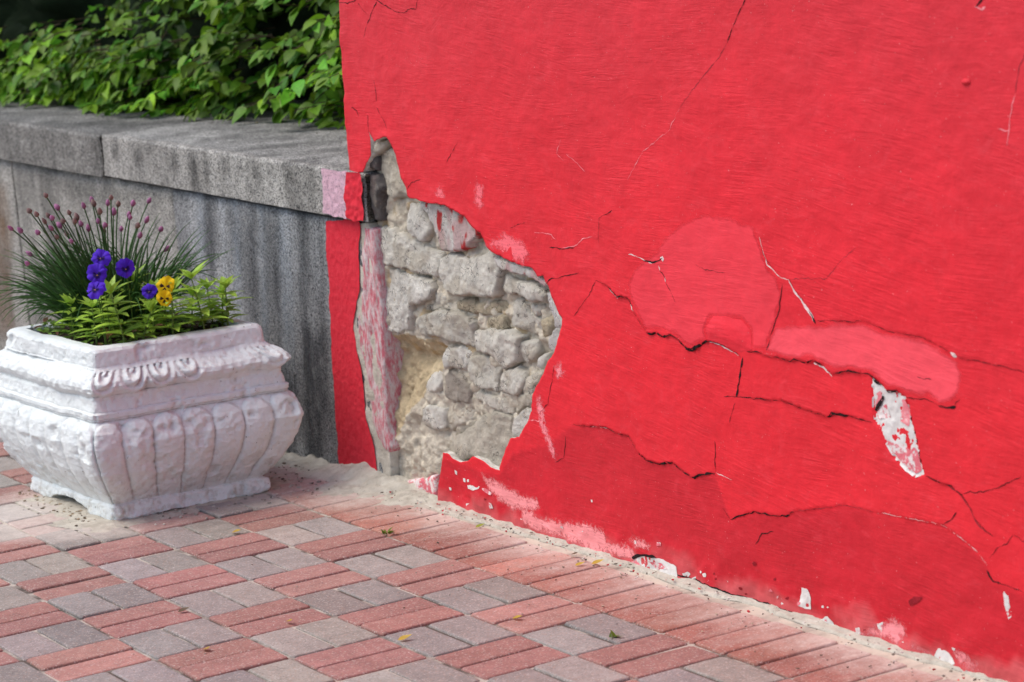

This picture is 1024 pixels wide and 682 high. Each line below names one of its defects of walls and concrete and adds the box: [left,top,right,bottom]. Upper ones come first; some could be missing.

crack [339,0,417,35]
spalling [353,139,562,509]
crack [546,238,1022,422]
crack [531,367,731,480]
peeling [871,377,924,478]
crack [730,476,1024,591]
crack [677,574,792,612]
peeling [769,578,834,625]